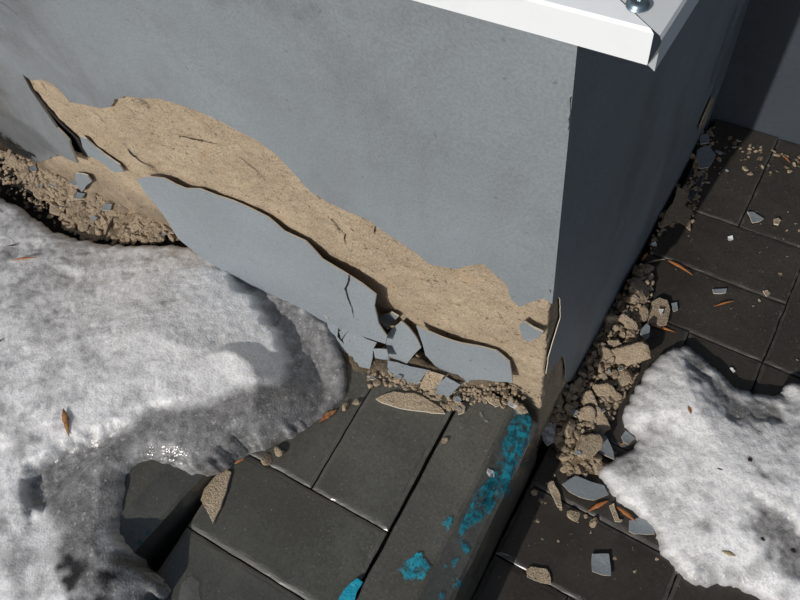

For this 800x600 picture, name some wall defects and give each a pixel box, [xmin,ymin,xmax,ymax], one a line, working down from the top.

flaking render [26,77,569,452]